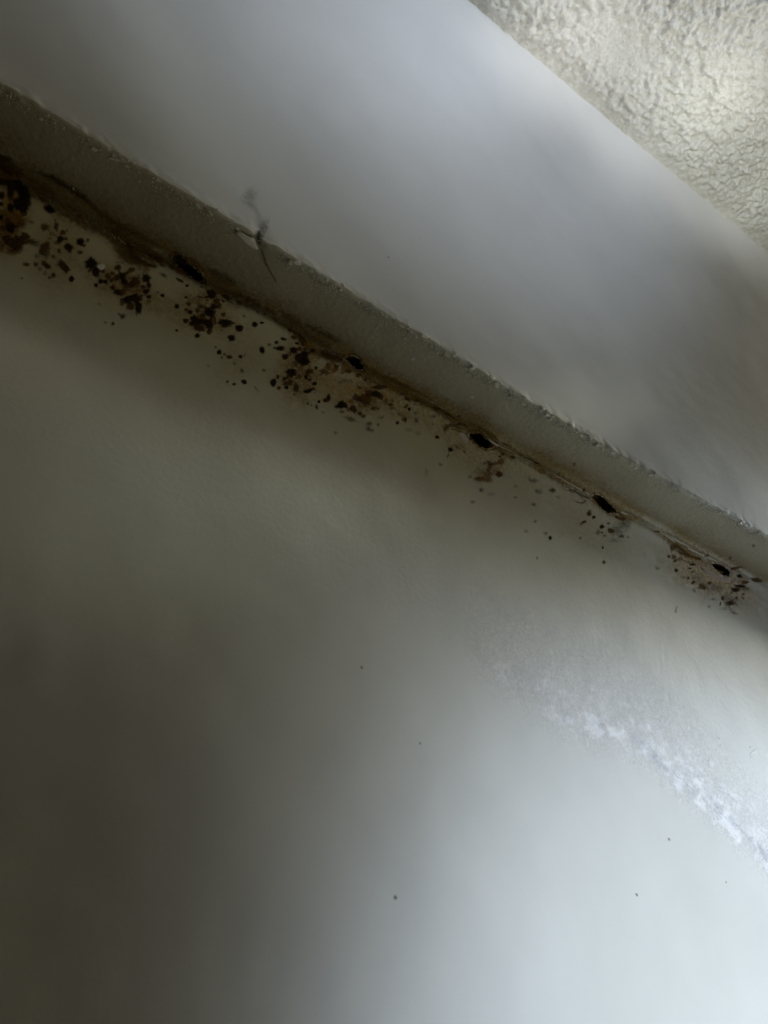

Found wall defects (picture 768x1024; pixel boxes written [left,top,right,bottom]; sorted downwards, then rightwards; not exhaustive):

damp [0,159,264,386]
crack [236,231,275,280]
damp [260,329,416,429]
damp [580,510,628,564]
damp [668,554,762,606]